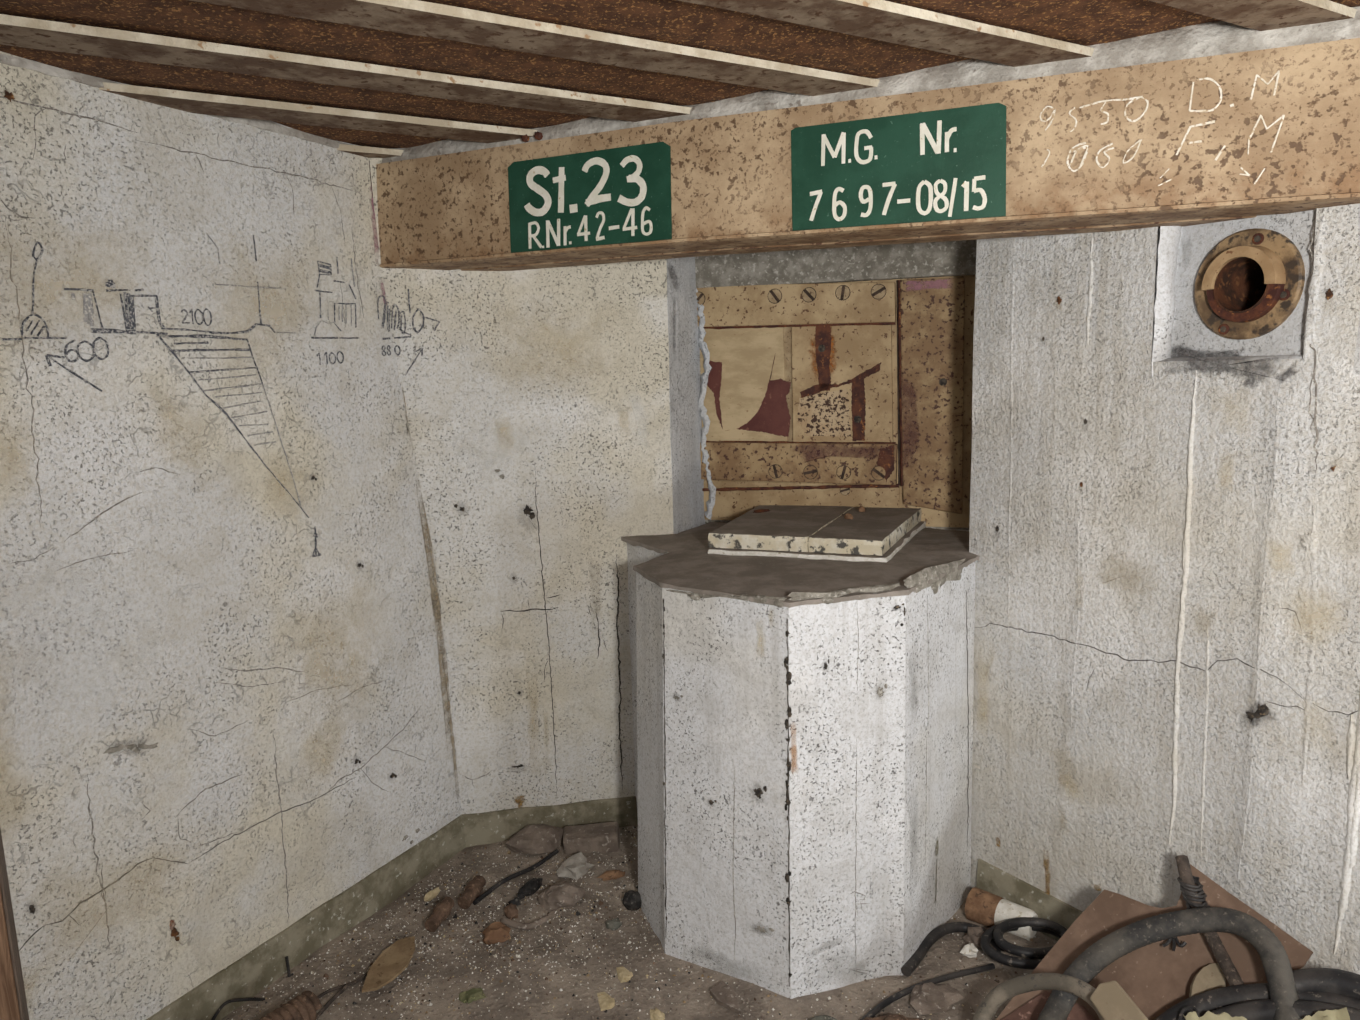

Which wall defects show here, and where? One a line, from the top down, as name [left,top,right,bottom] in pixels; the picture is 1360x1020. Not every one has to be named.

rust [798,326,918,481]
crack [19,706,423,951]
crack [215,667,384,702]
spalling [661,558,966,987]
crack [966,599,1358,846]